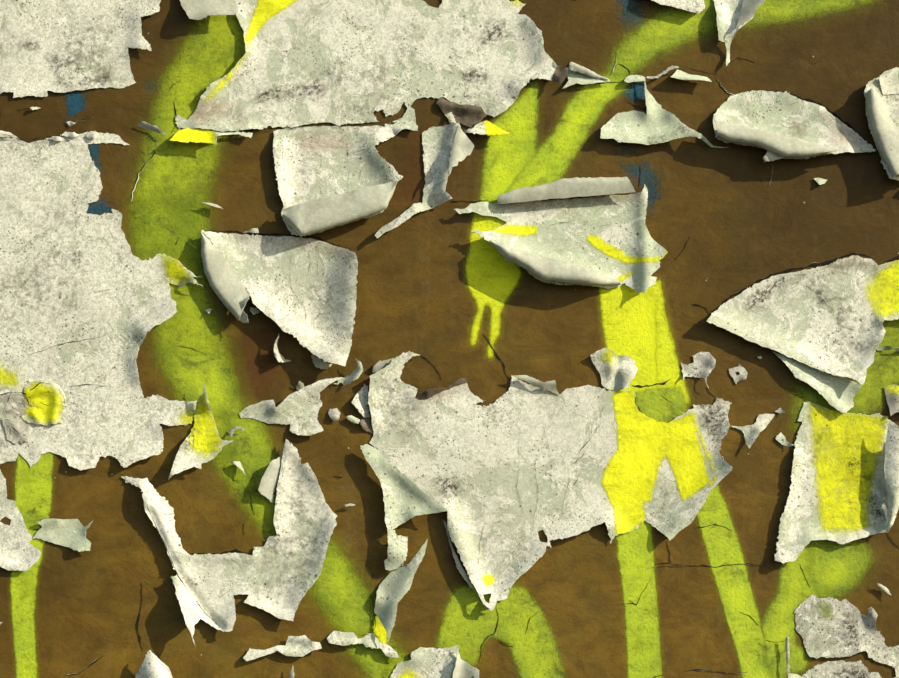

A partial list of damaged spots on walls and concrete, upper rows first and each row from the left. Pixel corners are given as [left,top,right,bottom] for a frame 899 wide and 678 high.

peeling [600,65,899,181]
peeling [454,177,667,294]
peeling [0,0,610,644]
peeling [707,255,899,563]
peeling [243,348,785,678]
crack [628,541,776,605]
peeling [135,650,173,678]
peeling [785,594,899,678]